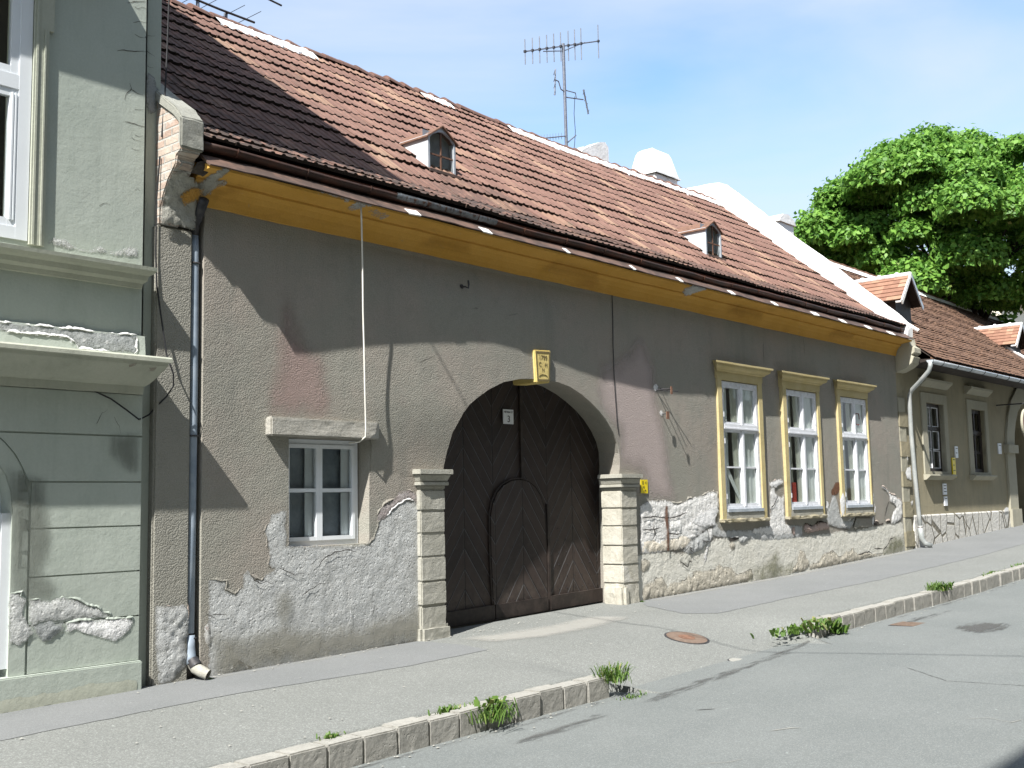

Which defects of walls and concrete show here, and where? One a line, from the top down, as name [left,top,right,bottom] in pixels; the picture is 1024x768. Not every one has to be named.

spalling [160,161,229,230]
flaking render [0,320,138,367]
spalling [640,479,882,601]
flaking render [872,485,913,526]
flaking render [204,489,419,676]
flaking render [8,590,134,646]
flaking render [155,604,190,683]